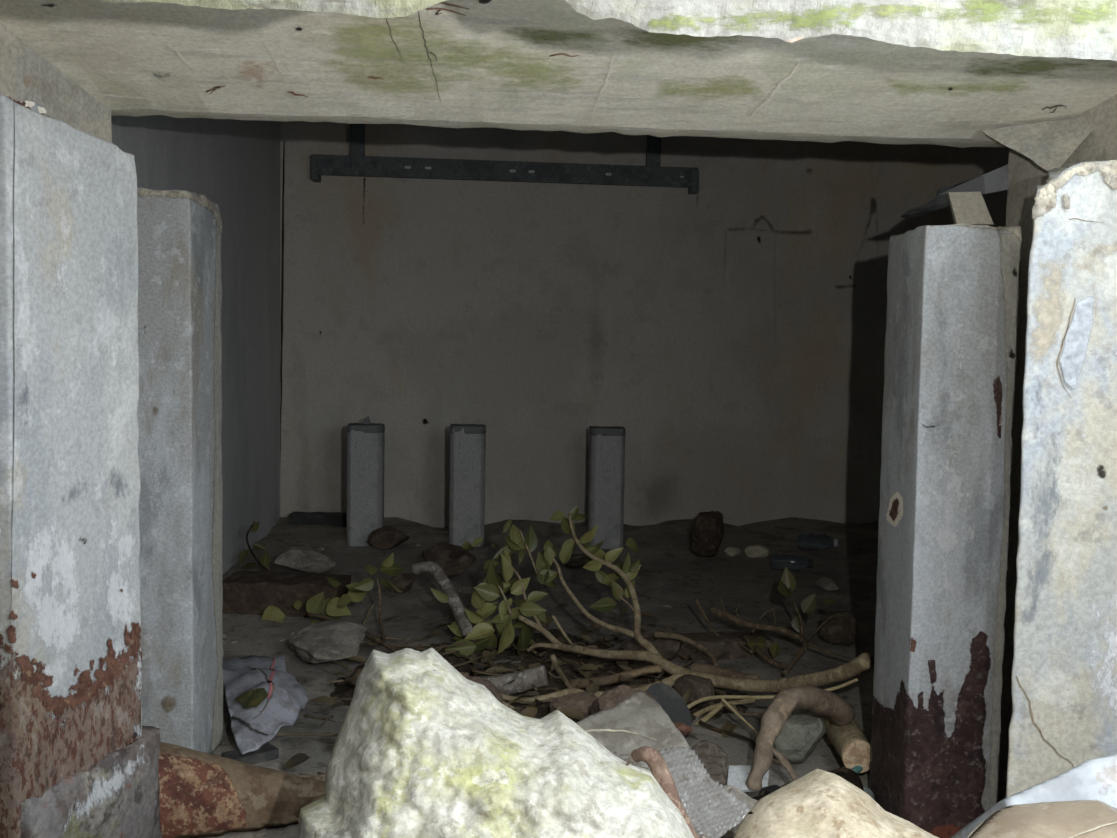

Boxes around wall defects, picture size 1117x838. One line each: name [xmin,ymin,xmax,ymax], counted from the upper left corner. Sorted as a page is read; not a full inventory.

crack [386,11,440,97]
crack [1042,105,1067,113]
spalling [1031,160,1117,219]
rust [993,376,1002,438]
rust [0,610,143,838]
crack [1016,676,1074,768]